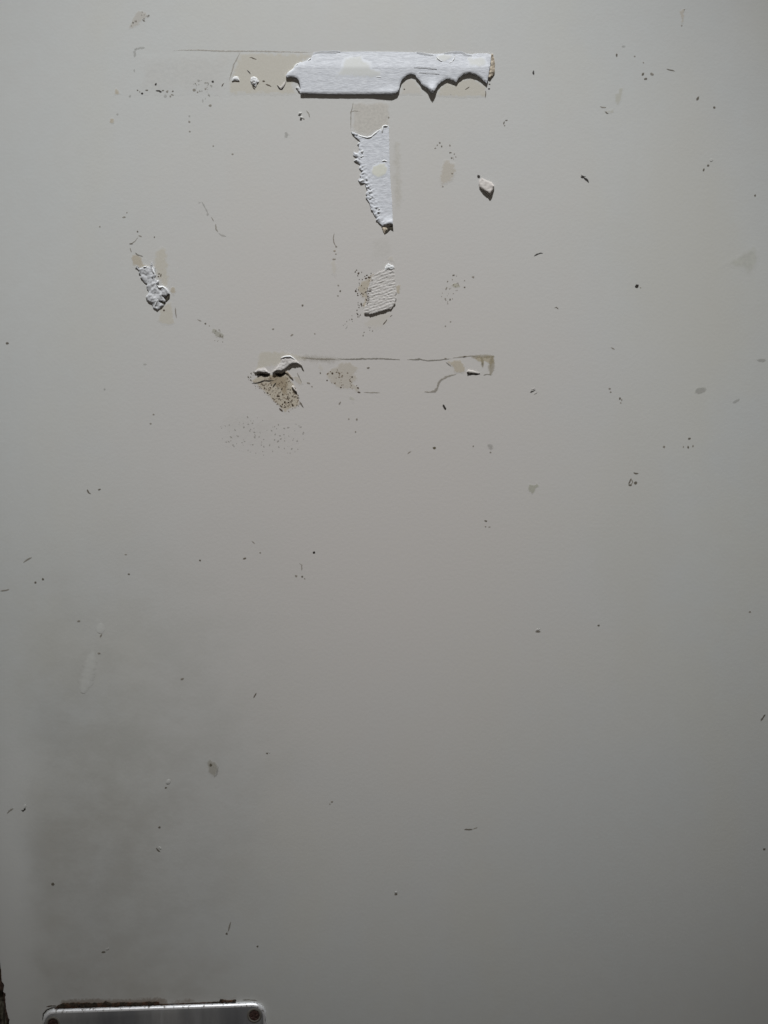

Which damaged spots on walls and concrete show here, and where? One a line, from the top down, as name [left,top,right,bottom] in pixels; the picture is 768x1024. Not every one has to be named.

peeling [279,50,495,95]
peeling [351,125,393,234]
peeling [130,231,176,327]
peeling [346,253,401,336]
peeling [248,349,309,414]